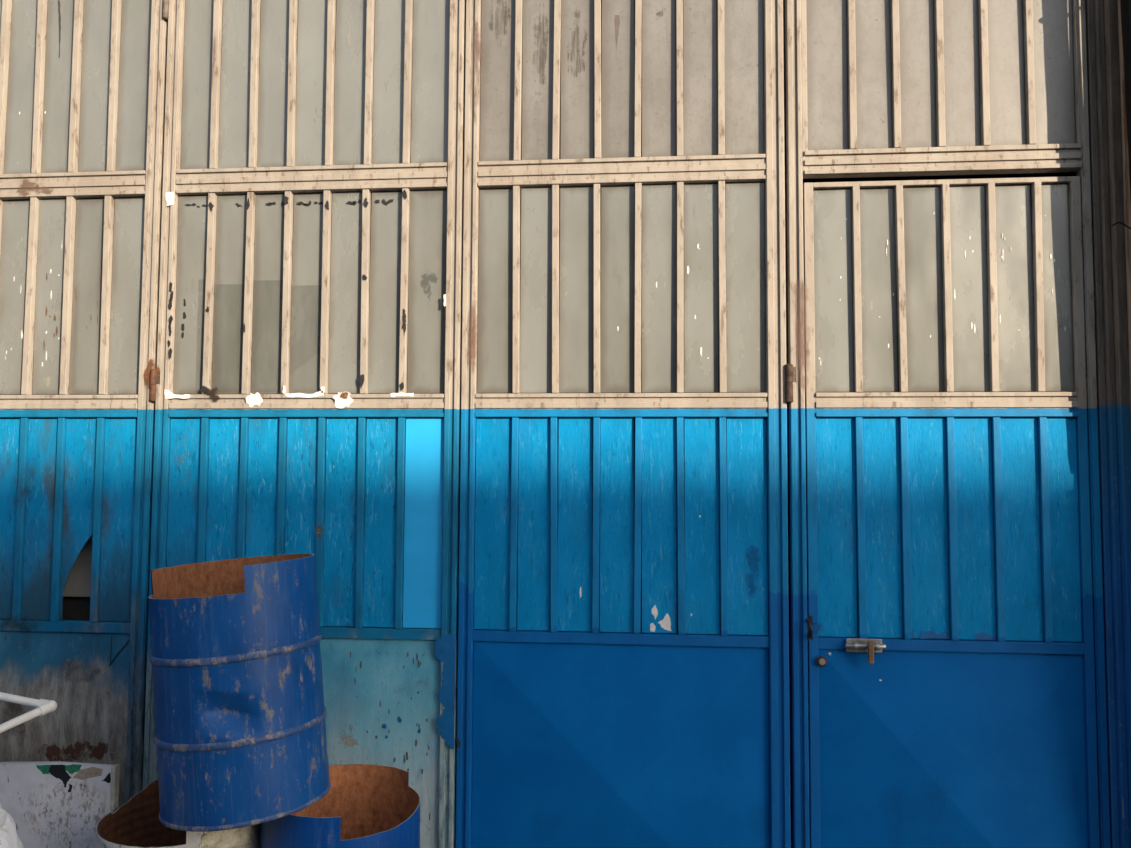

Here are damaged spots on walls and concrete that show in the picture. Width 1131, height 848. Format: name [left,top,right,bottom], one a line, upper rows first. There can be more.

rust [144,359,160,389]
peeling [650,605,671,632]